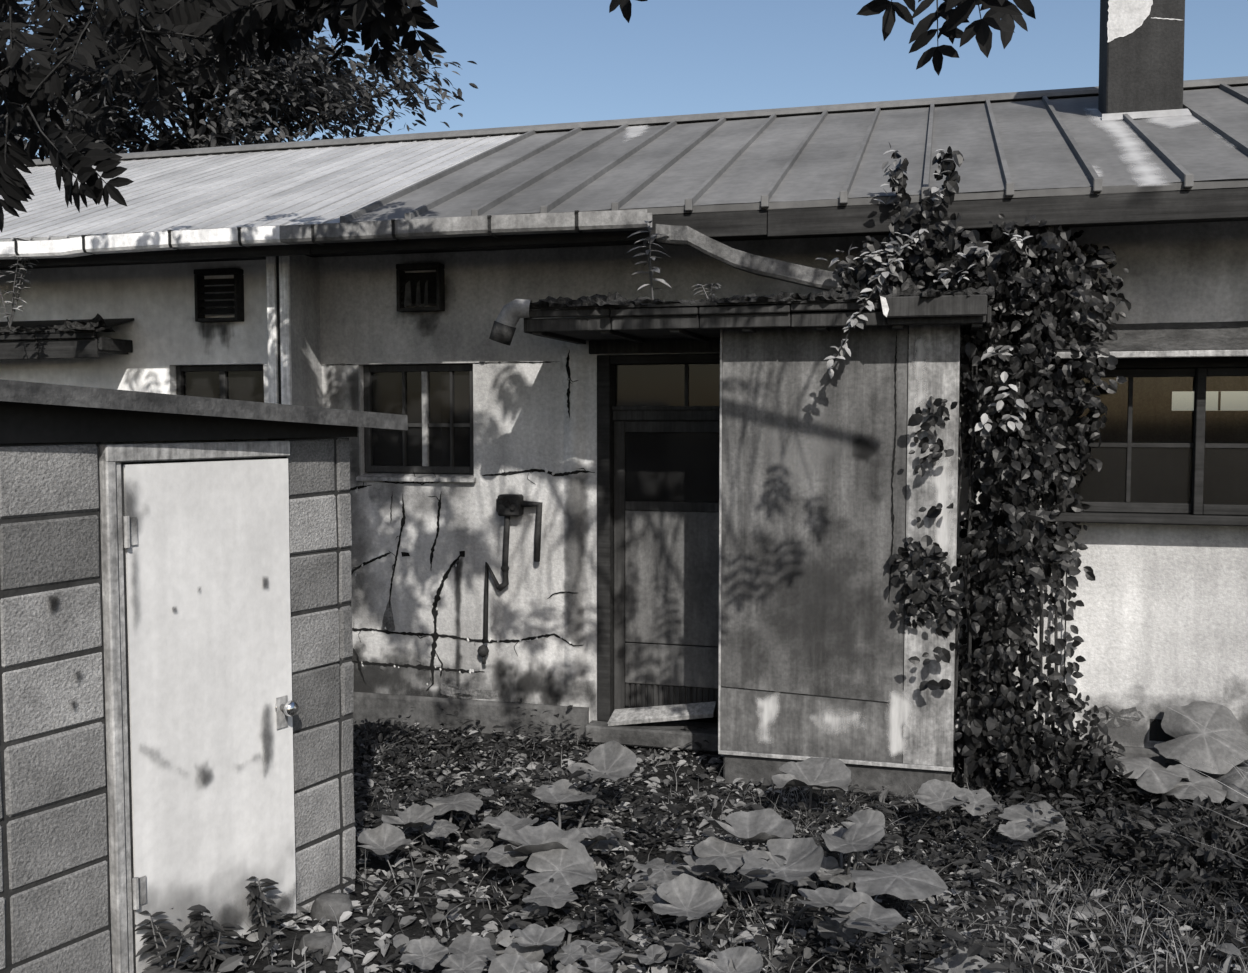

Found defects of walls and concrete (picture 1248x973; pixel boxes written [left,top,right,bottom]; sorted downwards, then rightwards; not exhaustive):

peeling [1107,0,1153,42]
crack [479,347,578,419]
crack [350,470,583,691]
water stain [765,559,875,664]
water stain [352,646,596,707]
peeling [758,697,778,741]
peeling [889,693,910,755]
water stain [1096,705,1164,748]
water stain [1238,714,1248,735]